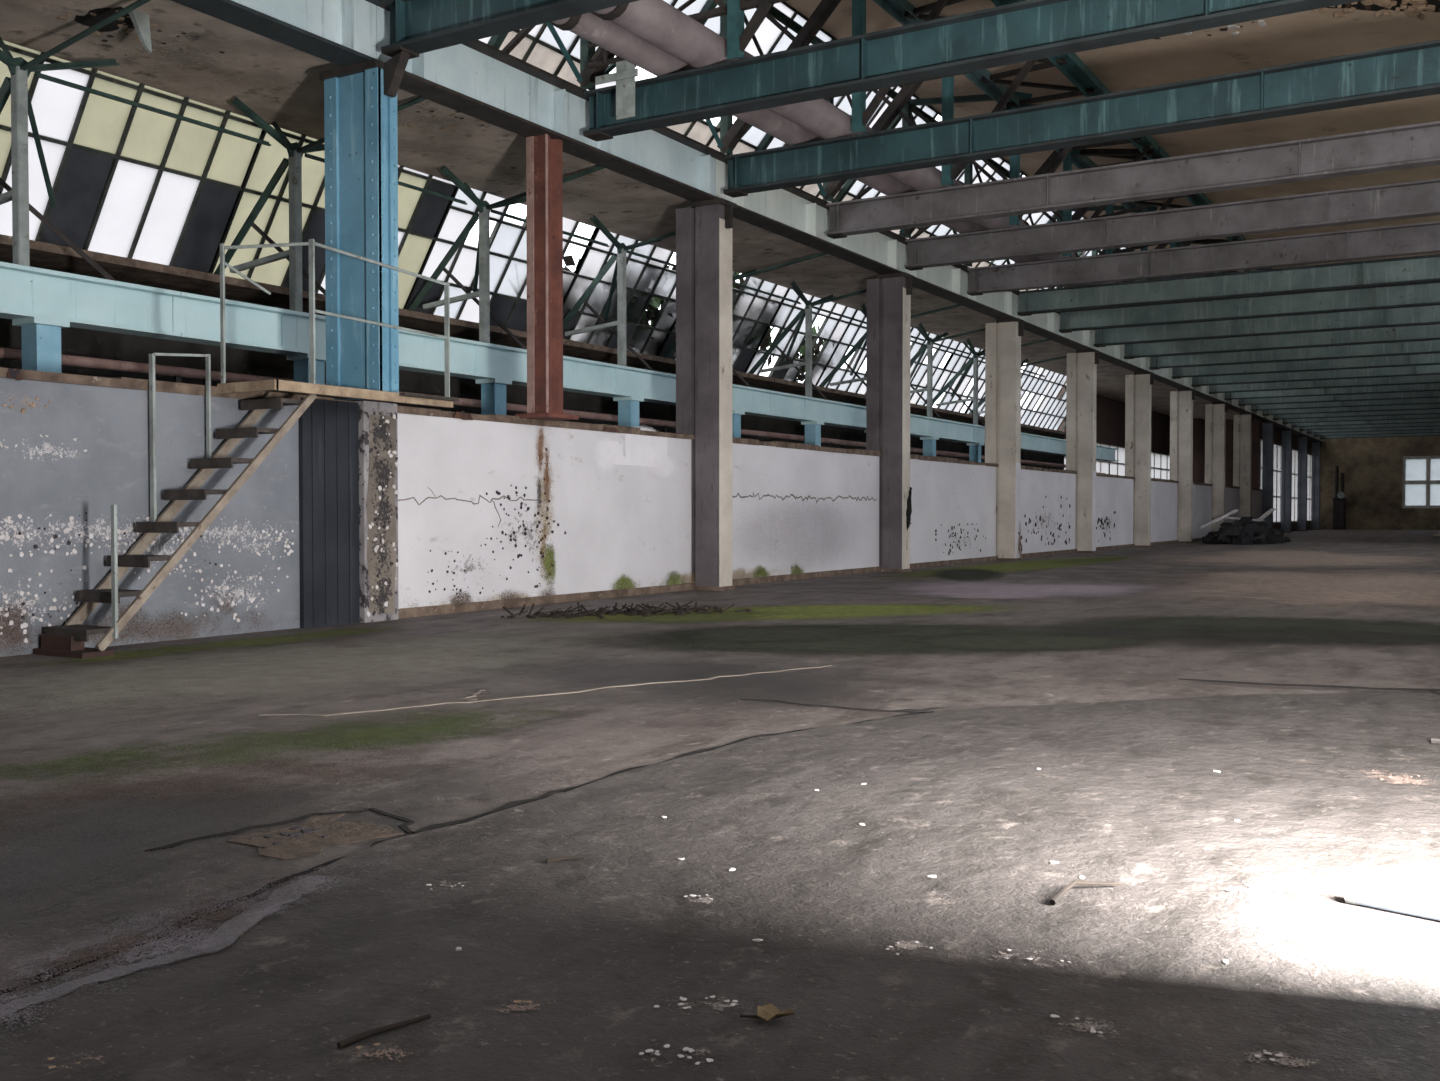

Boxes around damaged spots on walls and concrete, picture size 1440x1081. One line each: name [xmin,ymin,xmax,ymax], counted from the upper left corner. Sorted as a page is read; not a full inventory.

peeling [1312,0,1440,20]
flaking render [367,405,399,617]
damp [0,594,60,657]
damp [83,587,300,646]
crack [0,665,945,995]